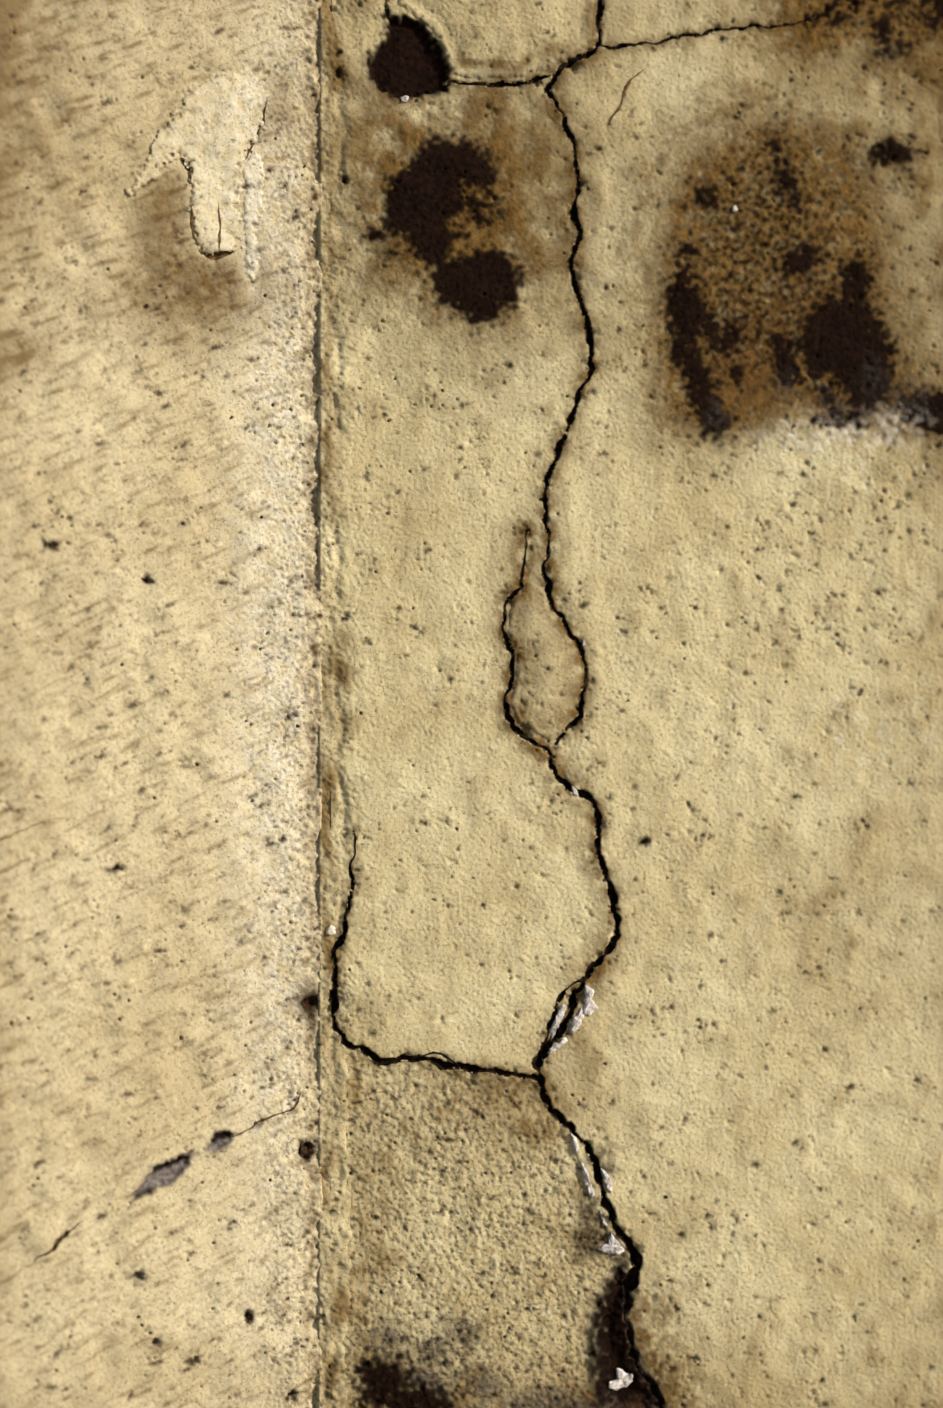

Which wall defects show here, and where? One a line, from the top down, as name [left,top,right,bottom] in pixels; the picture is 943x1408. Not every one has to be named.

water stain [350,89,562,330]
water stain [635,104,943,447]
crack [329,0,814,1408]
spalling [133,1155,189,1198]
spalling [207,1131,233,1151]
water stain [352,1321,497,1408]